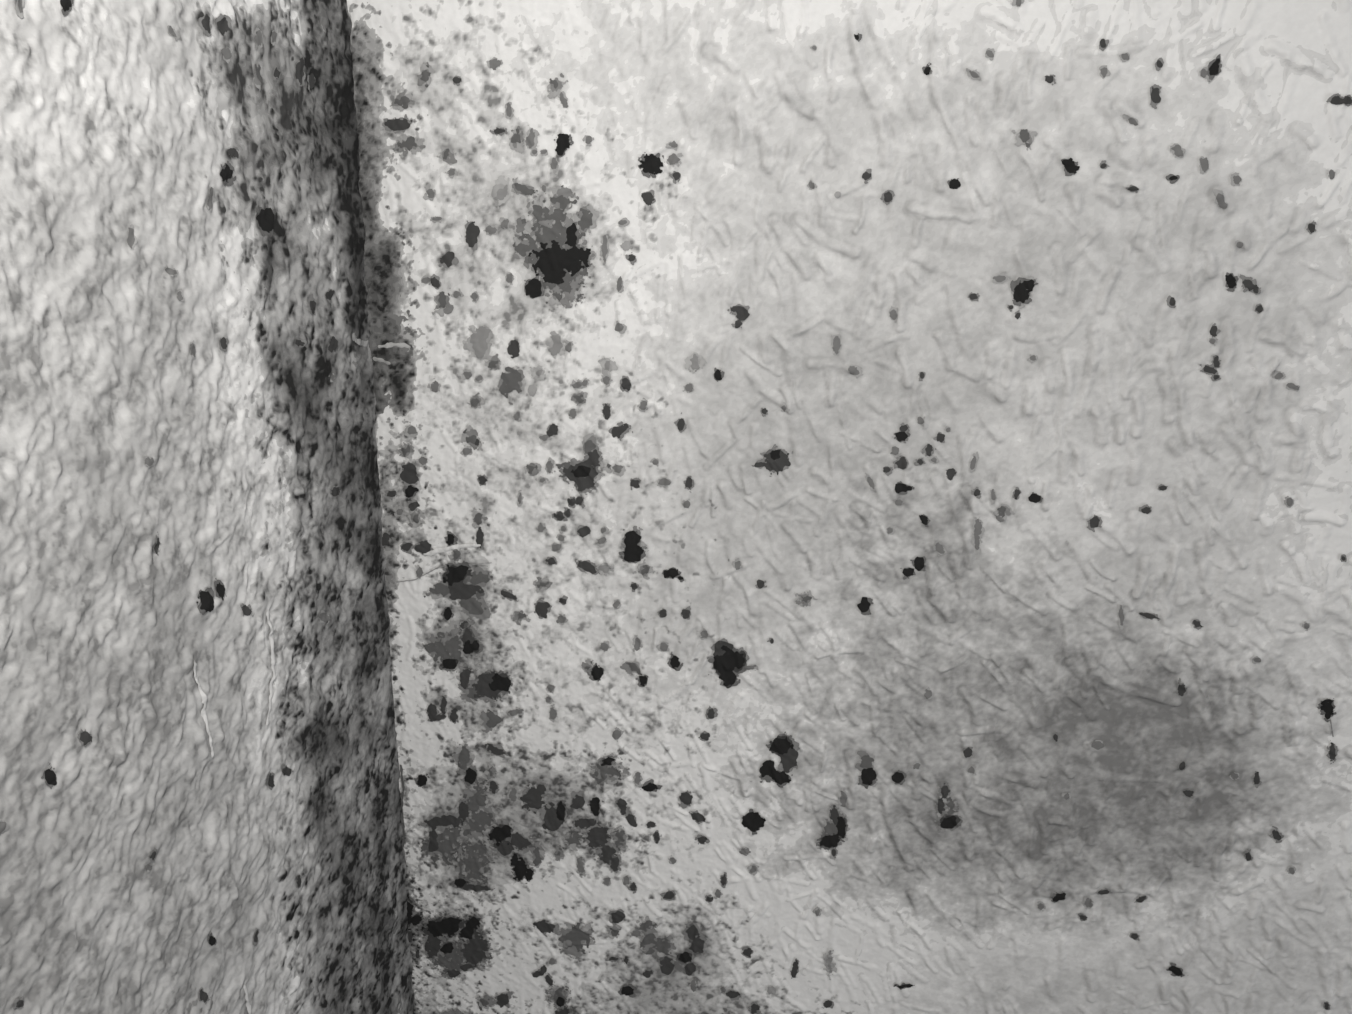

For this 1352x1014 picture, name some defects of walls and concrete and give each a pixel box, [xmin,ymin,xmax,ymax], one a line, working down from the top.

leakage [419,0,444,20]
leakage [201,239,235,273]
leakage [165,266,184,301]
leakage [219,337,229,352]
leakage [255,521,278,560]
leakage [196,578,227,615]
leakage [266,772,275,790]
leakage [512,850,533,869]
leakage [790,958,799,979]
leakage [823,950,837,980]
leakage [146,969,219,1014]
leakage [821,994,838,1009]